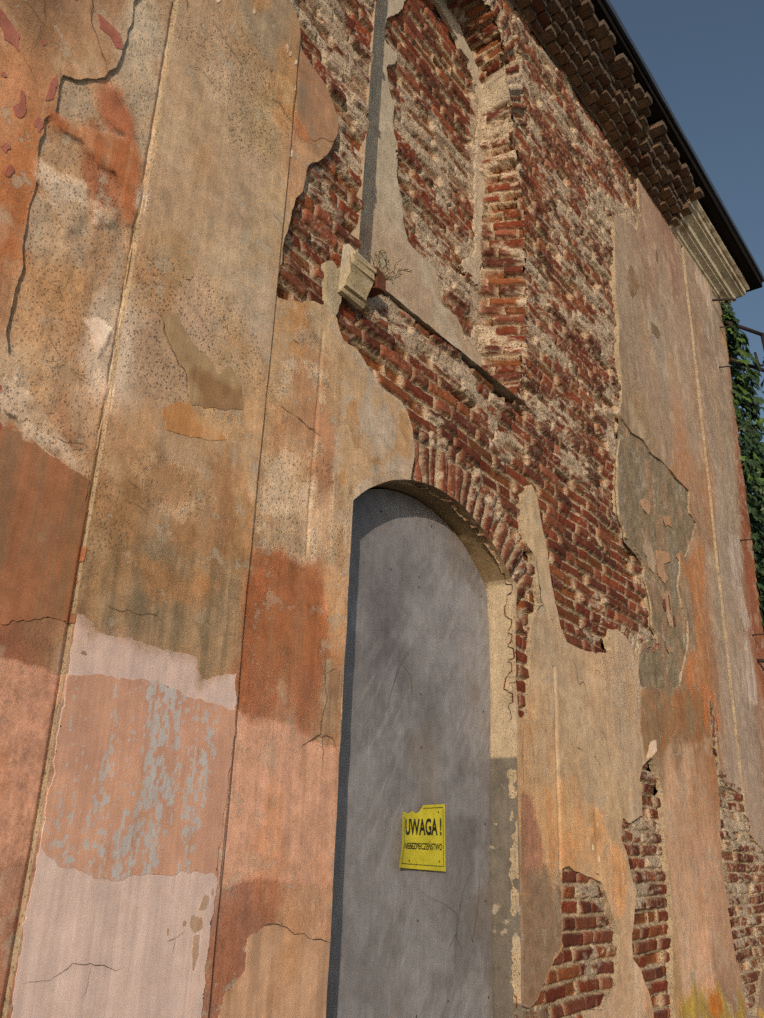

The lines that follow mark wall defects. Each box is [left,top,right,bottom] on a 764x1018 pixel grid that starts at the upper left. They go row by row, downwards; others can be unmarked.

spalling [161,311,243,441]
flaking render [255,0,695,722]
flaking render [513,868,617,1018]
flaking render [622,763,671,1018]
flaking render [710,702,764,1016]